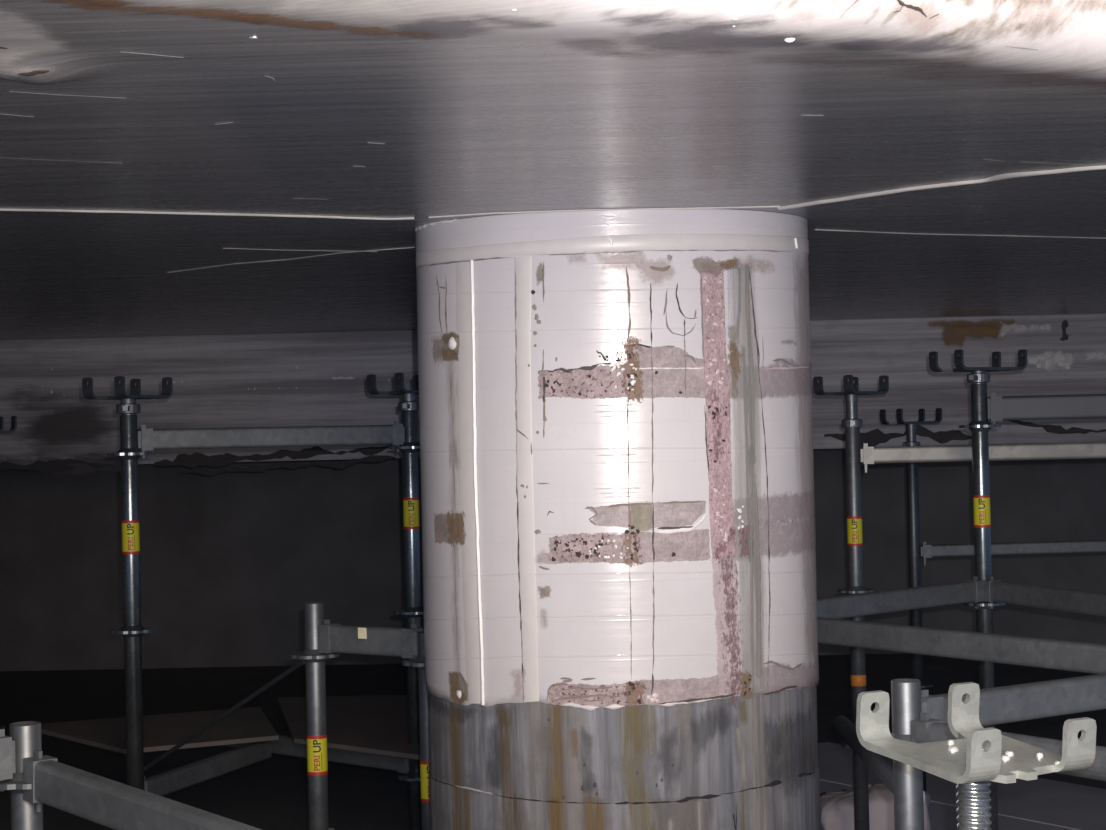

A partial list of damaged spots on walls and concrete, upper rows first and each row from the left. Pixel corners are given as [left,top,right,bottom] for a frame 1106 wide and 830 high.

crack [894,0,939,19]
spalling [528,263,819,711]
rust [551,705,562,830]
crack [498,773,812,830]